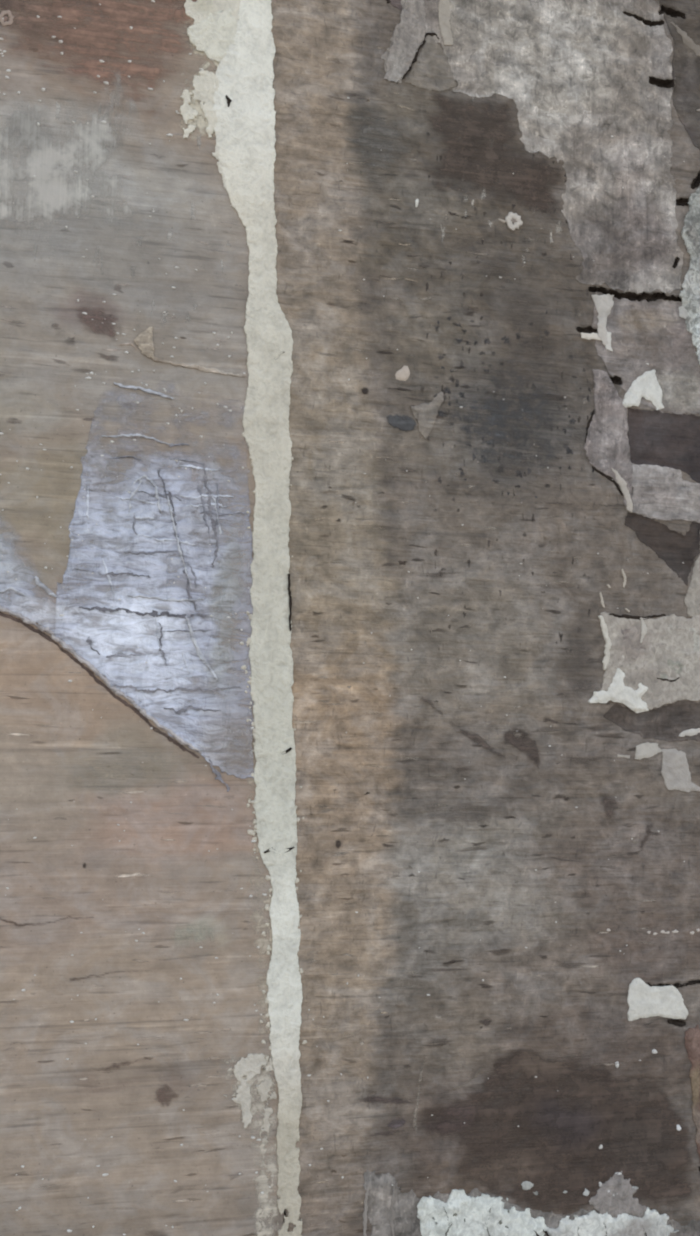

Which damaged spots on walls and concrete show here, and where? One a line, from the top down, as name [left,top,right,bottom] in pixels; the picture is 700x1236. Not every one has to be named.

damp [430,94,560,212]
peeling [498,212,523,231]
crack [589,257,682,302]
peeling [580,294,614,352]
peeling [623,370,664,410]
peeling [617,742,700,792]
peeling [627,978,688,1021]
spalling [157,1086,177,1106]
damp [424,1050,692,1215]
peeling [583,1173,647,1218]